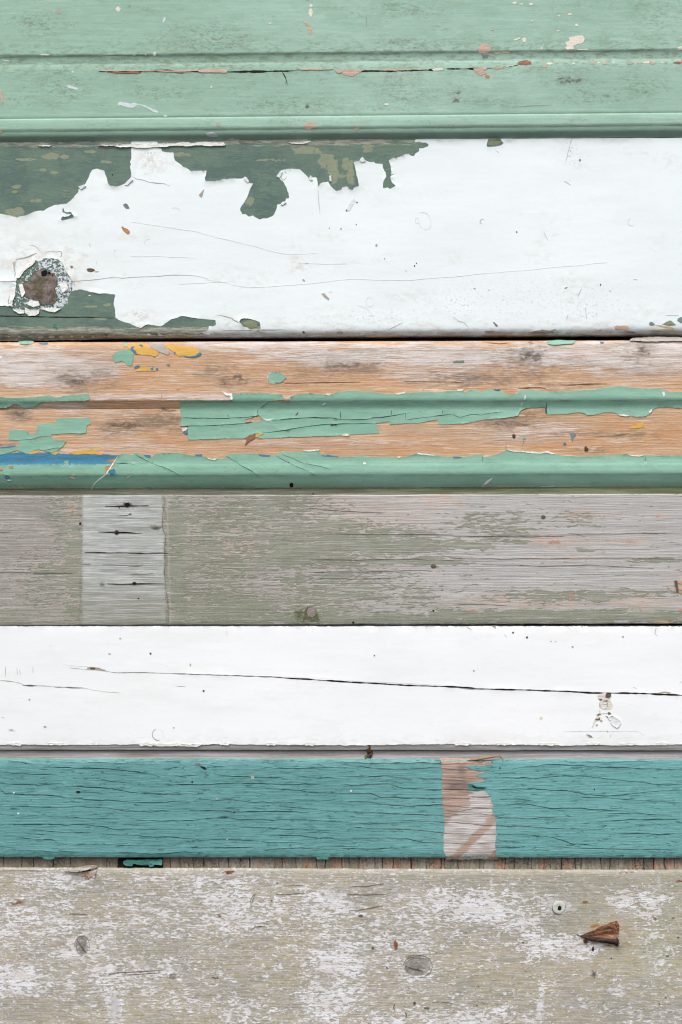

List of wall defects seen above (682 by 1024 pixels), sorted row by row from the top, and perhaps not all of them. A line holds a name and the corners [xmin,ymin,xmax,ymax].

peeling [479,37,526,58]
peeling [546,13,682,65]
peeling [0,122,429,220]
peeling [0,260,216,372]
peeling [239,318,261,331]
peeling [0,372,682,490]
crack [0,665,682,714]
peeling [338,742,550,860]
crack [0,760,682,943]